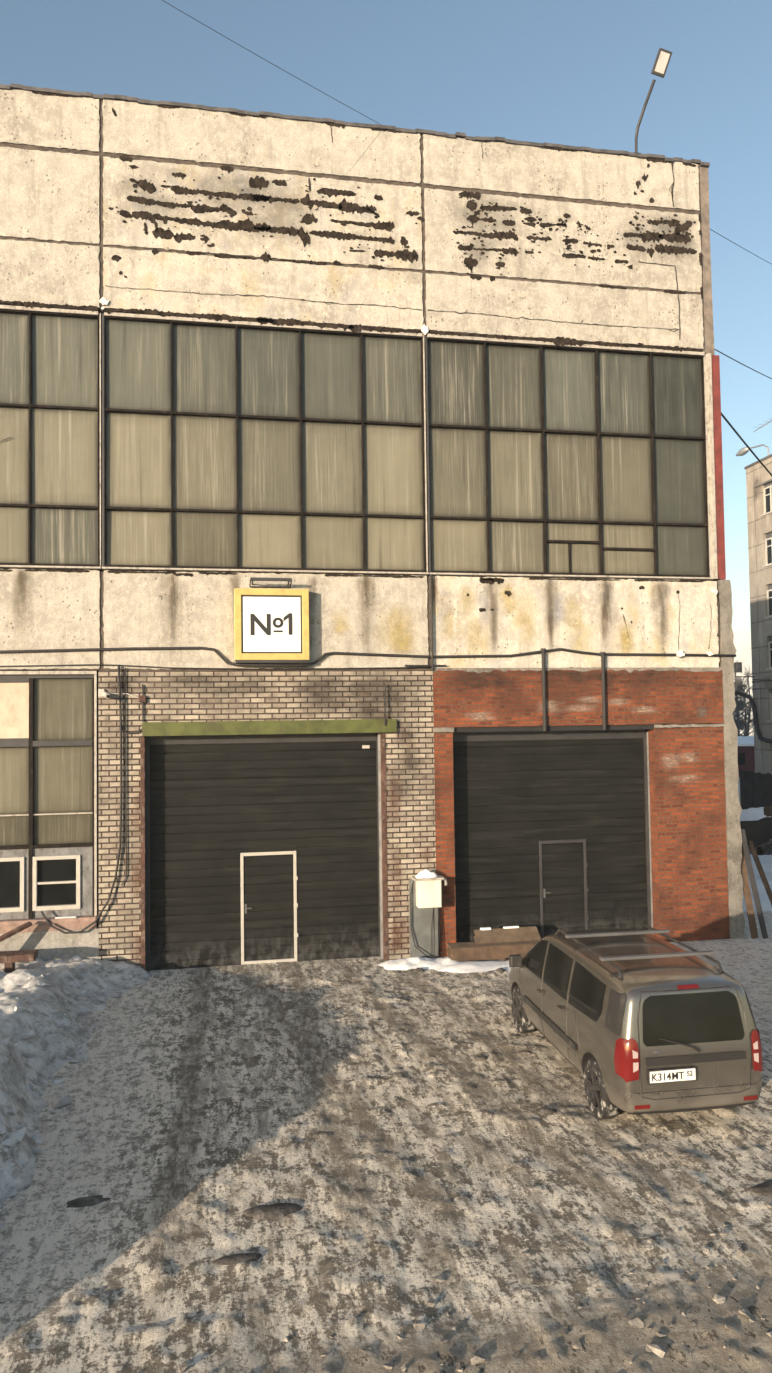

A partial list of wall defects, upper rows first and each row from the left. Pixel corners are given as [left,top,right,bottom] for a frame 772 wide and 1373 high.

peeling [109,154,424,270]
peeling [452,158,703,282]